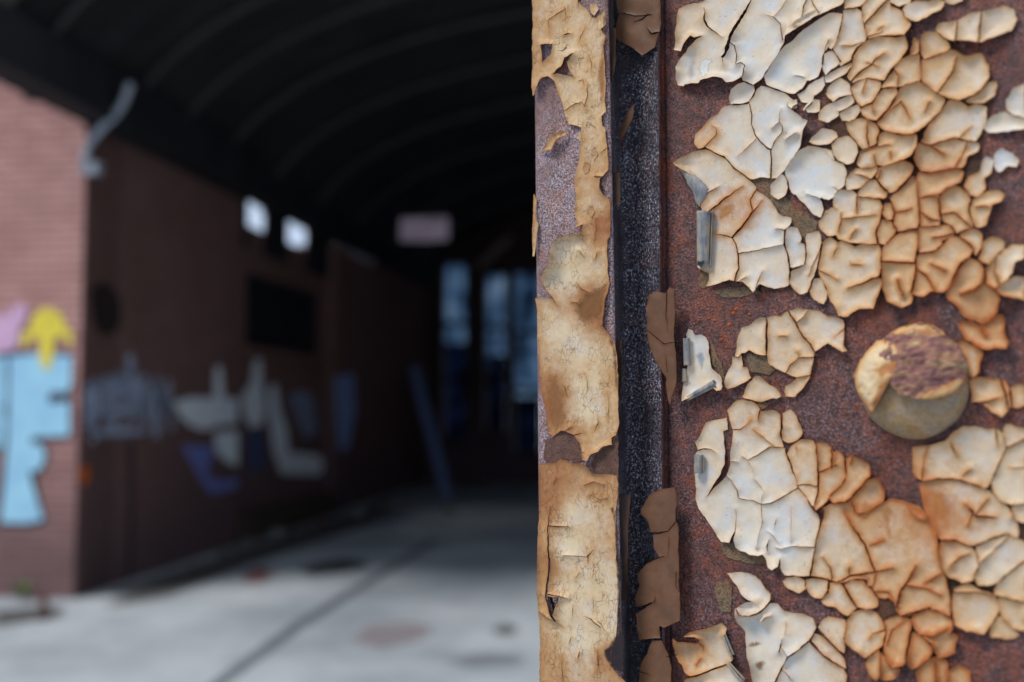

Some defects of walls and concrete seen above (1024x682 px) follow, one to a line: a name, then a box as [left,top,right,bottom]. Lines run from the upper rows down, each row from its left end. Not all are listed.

crack [705,4,750,65]
crack [718,107,772,254]
peeling [531,0,1024,682]
corrosion [879,323,968,399]
crack [741,449,856,524]
crack [857,501,885,568]